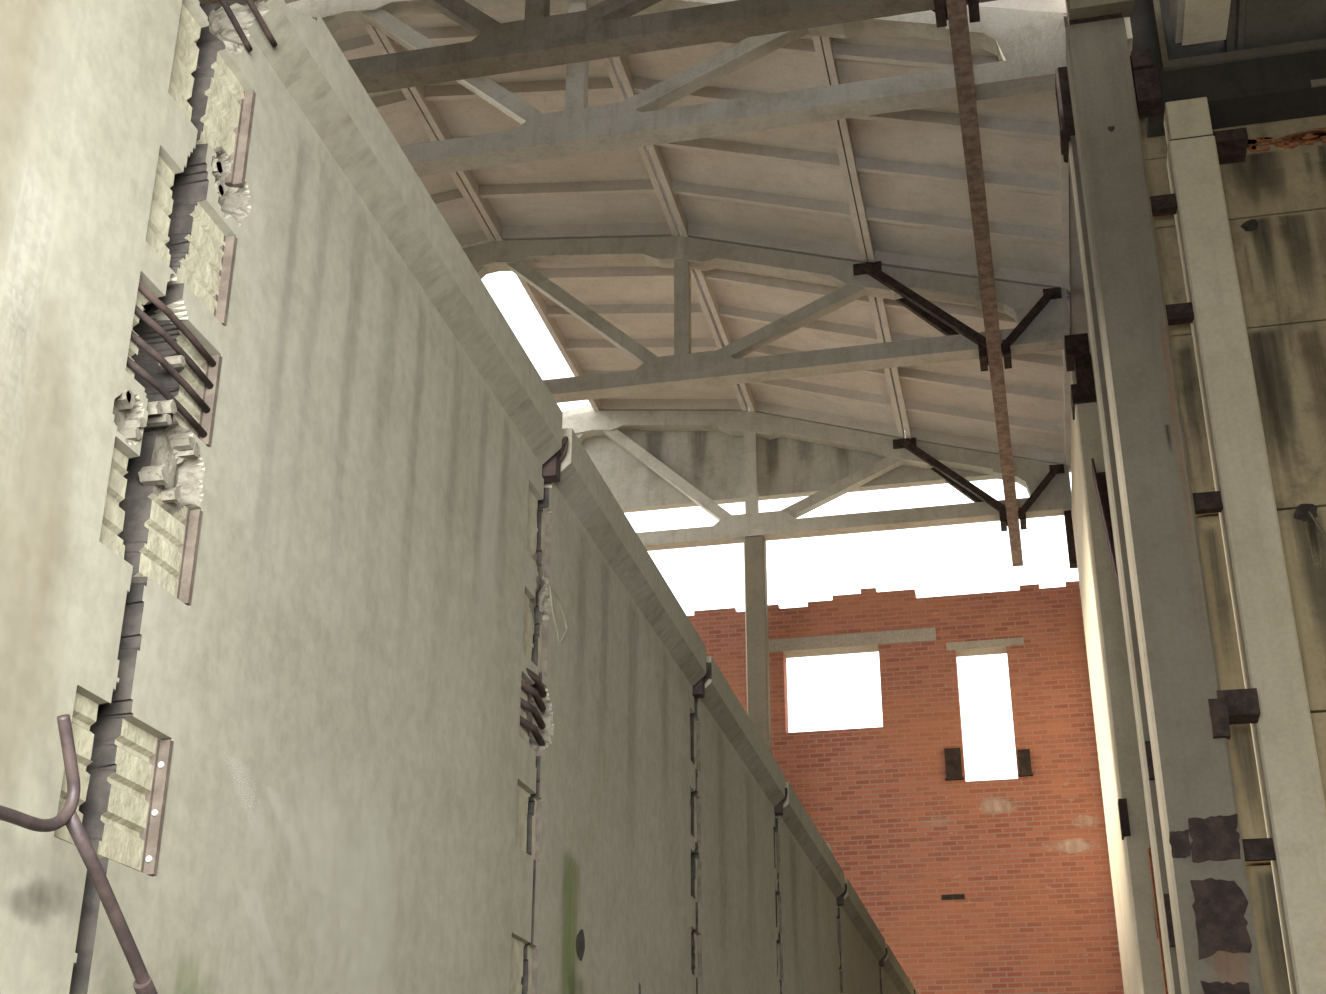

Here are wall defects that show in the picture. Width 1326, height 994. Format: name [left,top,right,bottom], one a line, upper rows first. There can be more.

spalling [209,0,277,53]
spalling [211,146,251,226]
water stain [1253,219,1272,262]
rust [1247,128,1326,152]
spalling [113,282,216,515]
water stain [1252,333,1290,420]
crack [69,4,226,994]
crack [528,487,568,702]
crack [521,750,541,994]
water stain [564,859,575,994]
crack [690,662,712,994]
water stain [1260,874,1286,982]